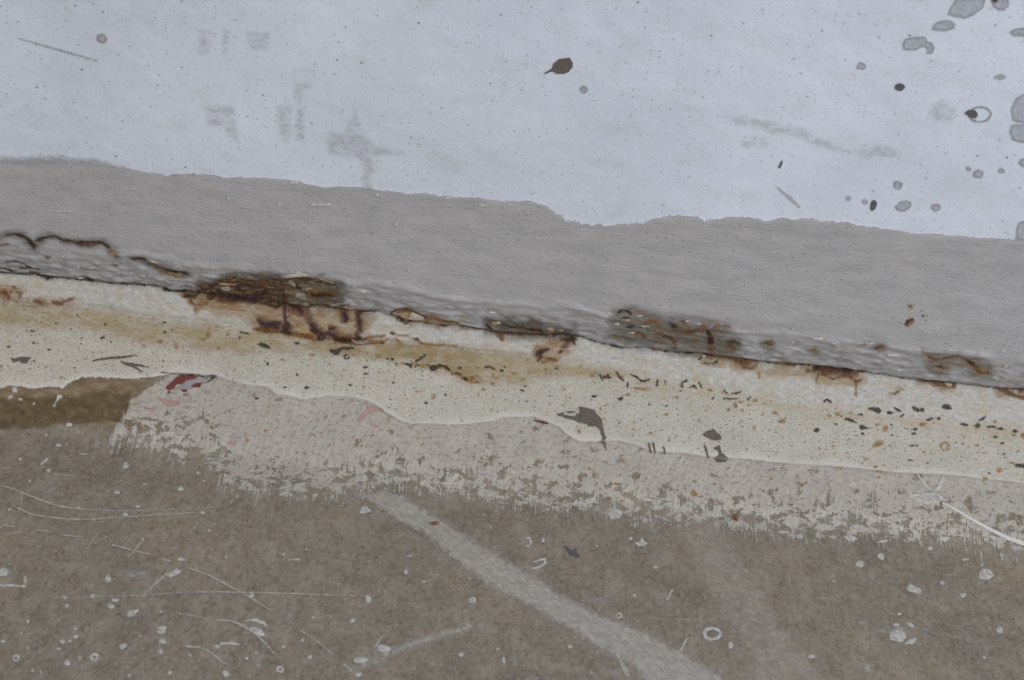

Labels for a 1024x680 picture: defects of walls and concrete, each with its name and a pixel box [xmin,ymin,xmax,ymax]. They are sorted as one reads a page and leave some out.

leakage [903,0,1009,54]
leakage [964,106,992,123]
leakage [1010,94,1024,143]
corrosion [0,233,117,267]
corrosion [131,257,585,373]
corrosion [402,362,485,391]
corrosion [612,308,864,394]
corrosion [917,350,991,391]
peeling [106,371,1024,567]